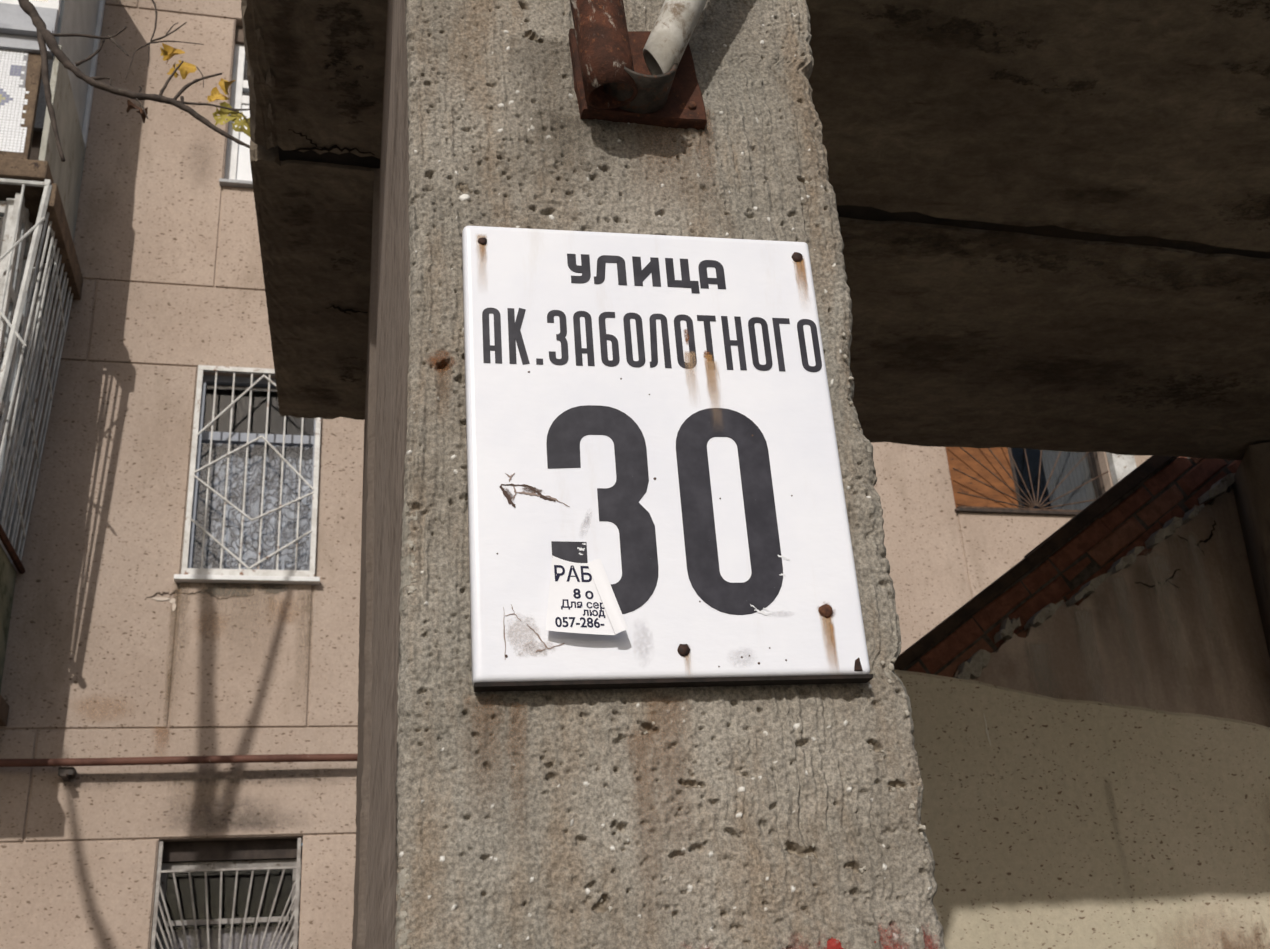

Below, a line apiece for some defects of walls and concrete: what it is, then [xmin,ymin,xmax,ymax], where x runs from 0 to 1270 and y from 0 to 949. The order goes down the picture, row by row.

crack [289,129,374,155]
corrosion [685,330,717,390]
spalling [955,473,1235,680]
corrosion [822,603,835,647]
spalling [879,623,912,718]